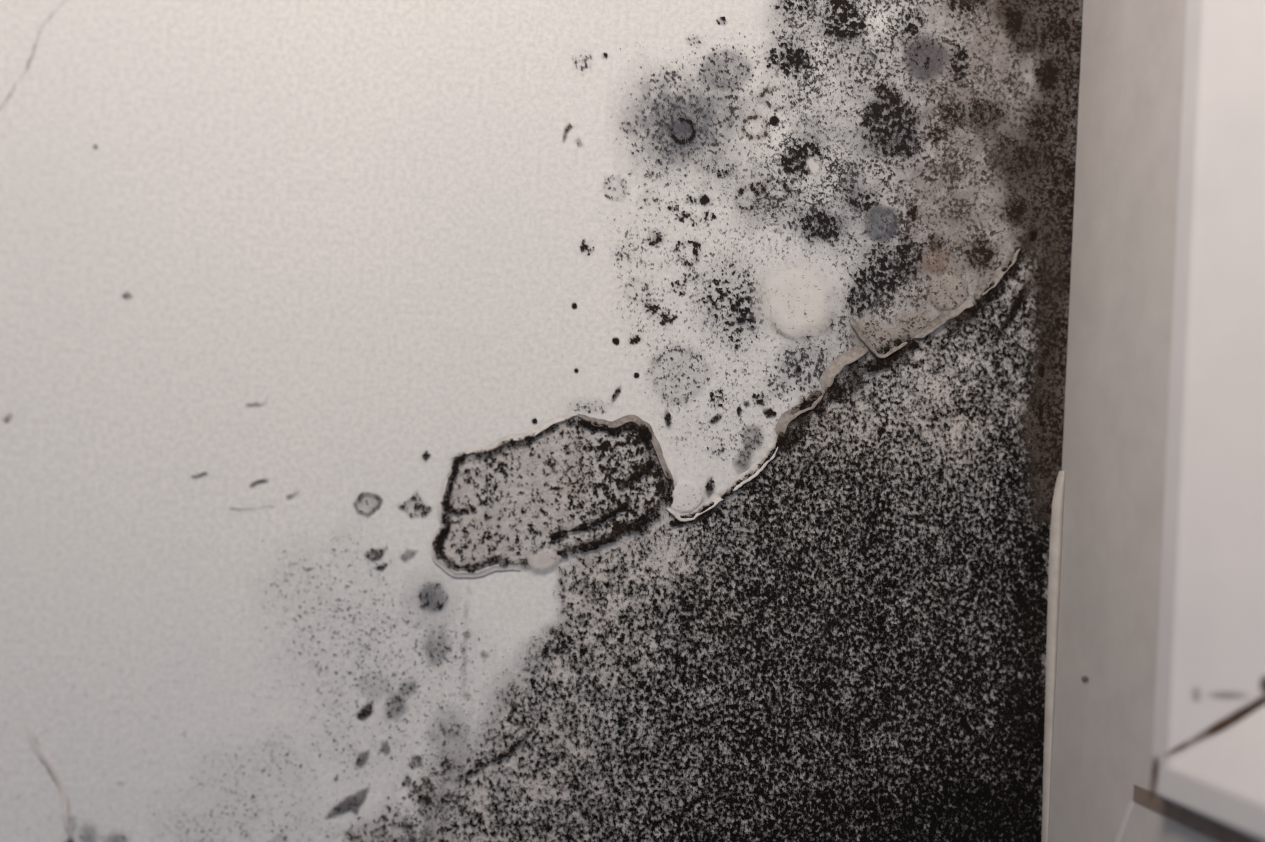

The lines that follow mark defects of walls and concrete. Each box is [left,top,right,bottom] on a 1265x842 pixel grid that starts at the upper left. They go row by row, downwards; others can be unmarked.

damp [570,0,1083,523]
crack [27,726,73,842]
damp [176,529,483,842]
flaking render [326,227,1068,842]